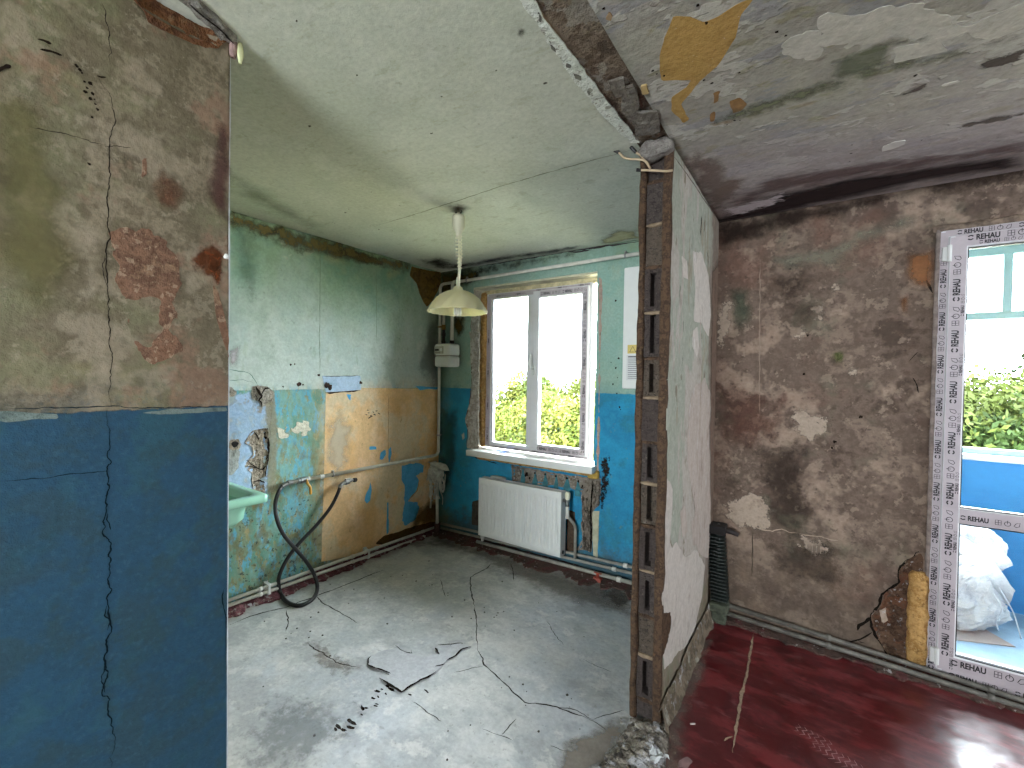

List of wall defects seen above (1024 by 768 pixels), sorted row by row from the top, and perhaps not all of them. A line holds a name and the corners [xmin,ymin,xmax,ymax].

spalling [134,0,226,48]
peeling [660,0,752,123]
peeling [781,2,1024,63]
damp [692,145,1022,245]
rust [193,245,223,284]
crack [12,2,227,762]
spalling [251,385,274,407]
spalling [229,428,270,492]
peeling [662,378,773,669]
crack [309,644,356,667]
crack [457,563,623,739]
spalling [870,551,923,660]